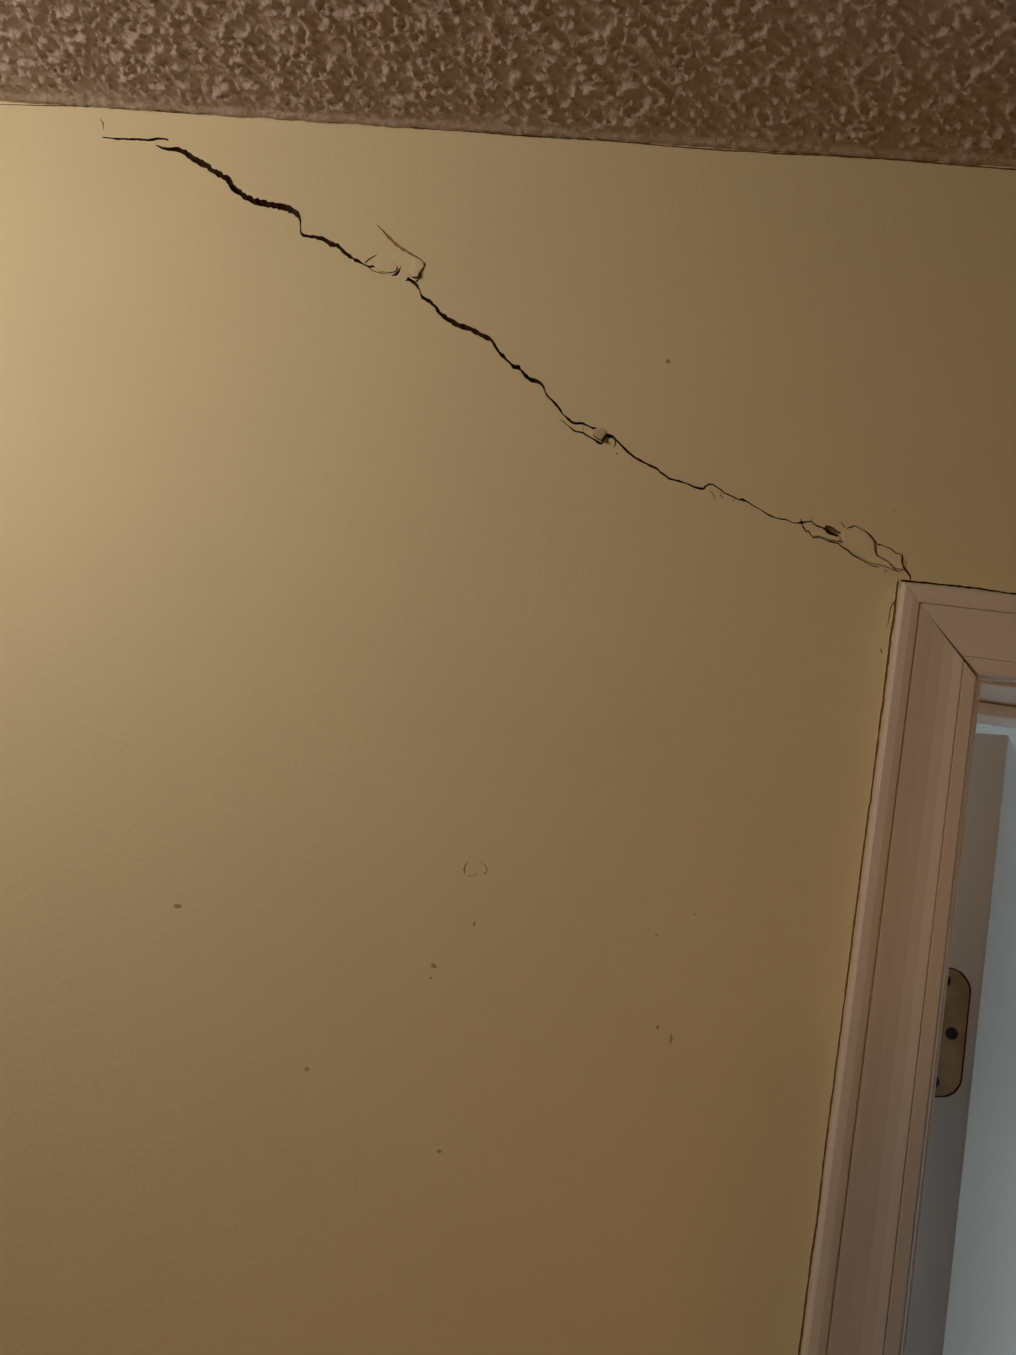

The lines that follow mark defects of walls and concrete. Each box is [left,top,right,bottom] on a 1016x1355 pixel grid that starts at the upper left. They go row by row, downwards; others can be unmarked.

crack [0,101,90,109]
crack [100,118,401,276]
crack [412,127,1016,171]
crack [377,225,1016,1355]